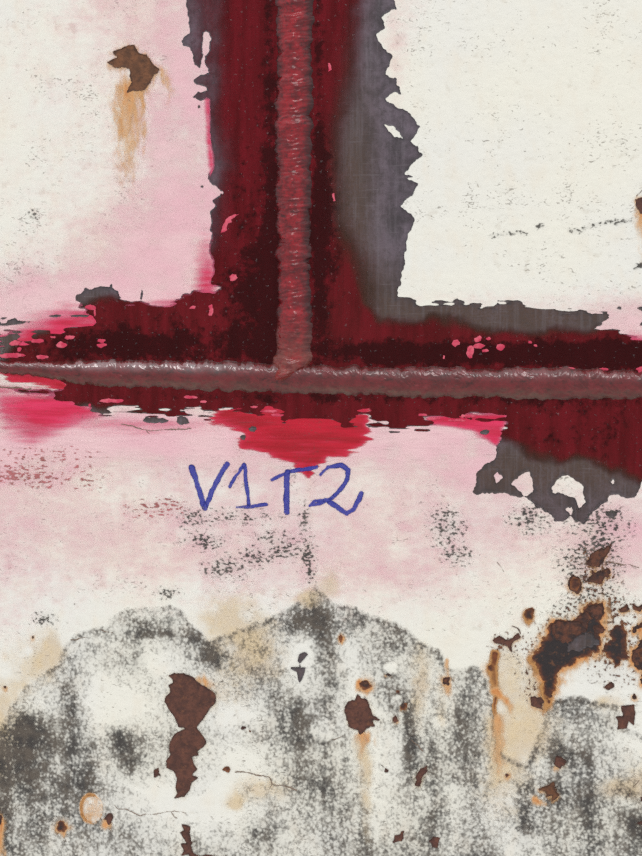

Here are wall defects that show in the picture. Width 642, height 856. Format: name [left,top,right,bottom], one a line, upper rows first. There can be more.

corrosion [107,45,168,165]
mould [0,649,172,856]
corrosion [154,673,216,798]
corrosion [180,824,213,856]
mould [74,590,499,856]
corrosion [344,679,380,776]
corrosion [485,544,642,786]
mould [499,697,642,856]
corrosion [606,774,642,801]